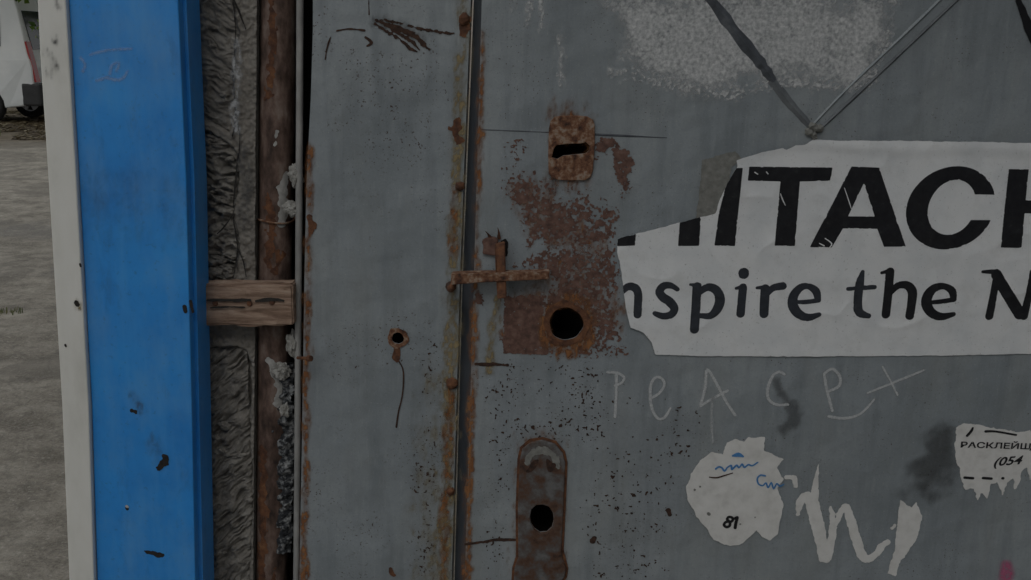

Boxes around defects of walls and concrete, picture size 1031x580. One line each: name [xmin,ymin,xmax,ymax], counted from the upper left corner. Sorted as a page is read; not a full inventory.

rust [447,42,485,268]
peeling [156,454,169,471]
rust [300,293,312,580]
rust [388,328,409,349]
rust [431,283,498,580]
rust [511,437,568,580]